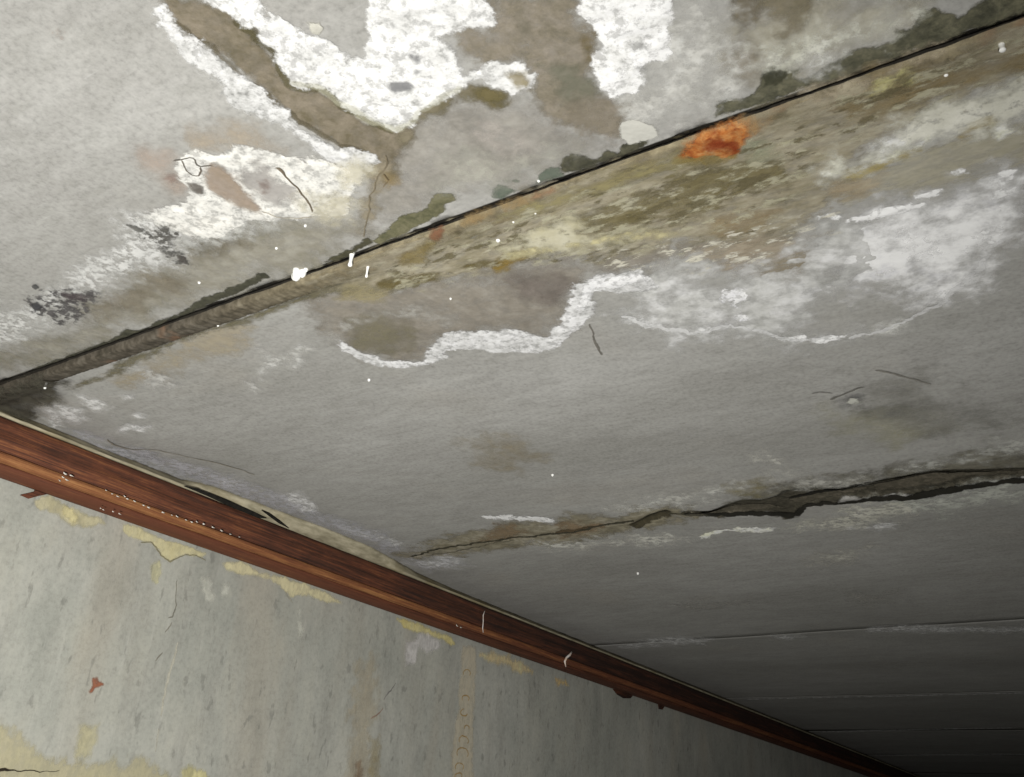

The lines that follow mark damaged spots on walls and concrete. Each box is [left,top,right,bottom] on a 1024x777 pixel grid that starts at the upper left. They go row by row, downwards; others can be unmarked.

rust [680,120,758,163]
crack [0,12,1024,385]
damp [0,0,1024,568]
crack [812,370,930,400]
peeling [35,495,206,582]
crack [411,468,1024,557]
peeling [225,562,339,603]